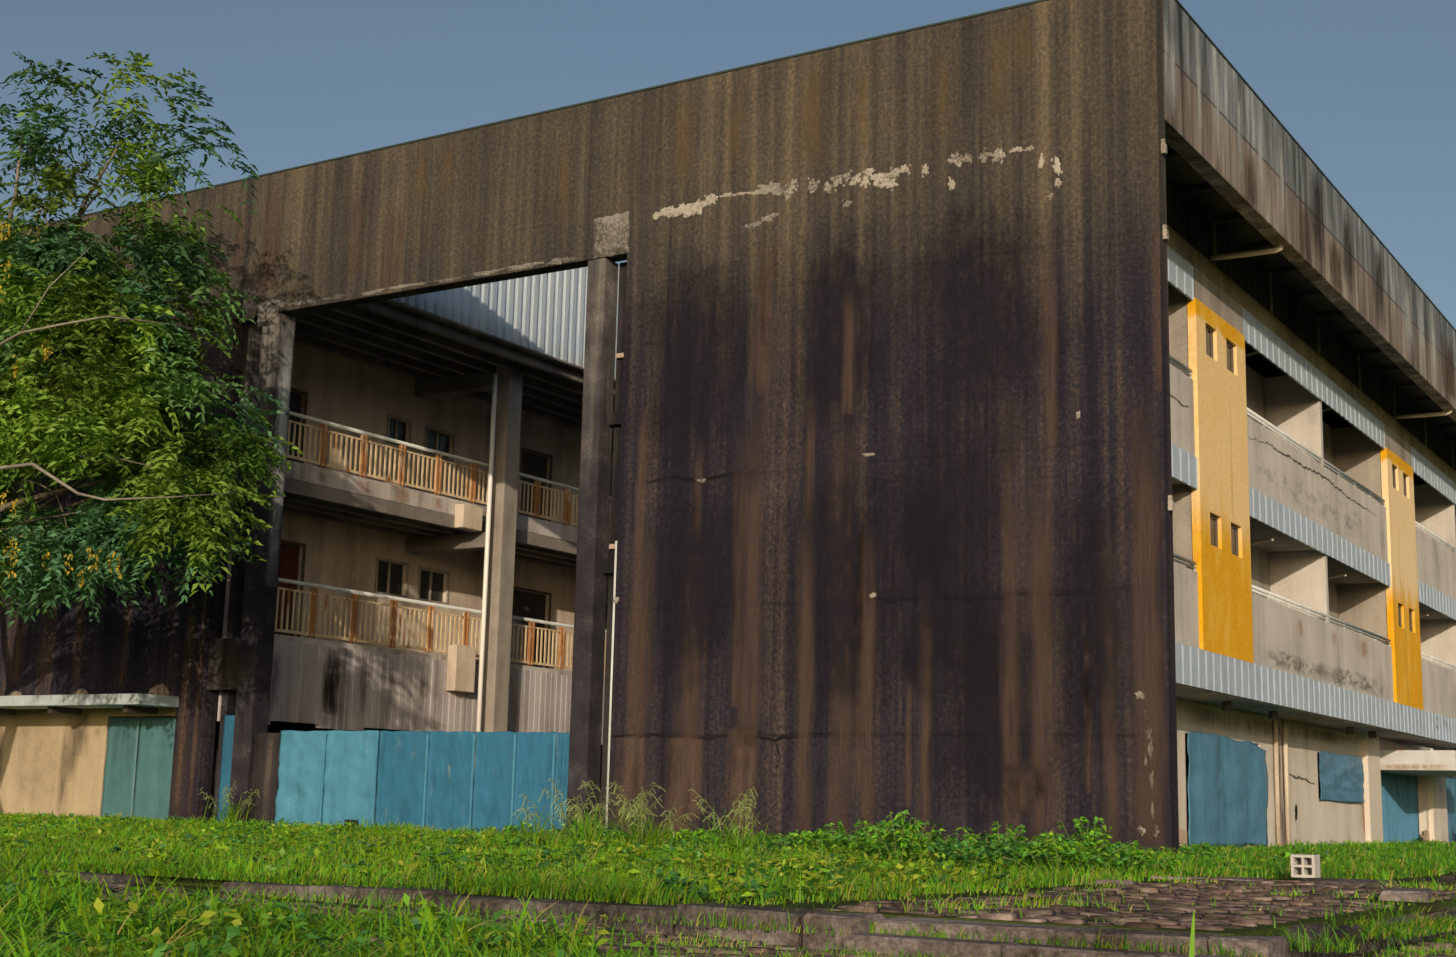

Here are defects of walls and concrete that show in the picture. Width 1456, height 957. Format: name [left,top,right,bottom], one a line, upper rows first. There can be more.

damp [1164,23,1175,95]
damp [1197,65,1219,124]
flaking render [653,163,929,230]
flaking render [947,145,1063,200]
damp [1314,185,1322,247]
damp [1344,222,1352,274]
damp [1374,258,1382,305]
damp [808,250,873,408]
damp [1405,292,1436,368]
crack [1248,437,1377,516]
damp [323,663,339,711]
rust [798,580,813,832]